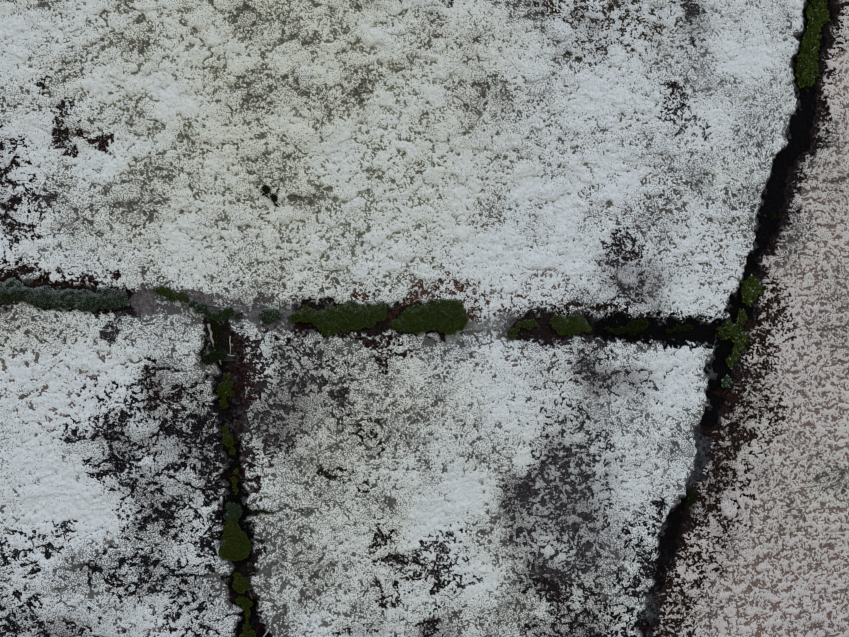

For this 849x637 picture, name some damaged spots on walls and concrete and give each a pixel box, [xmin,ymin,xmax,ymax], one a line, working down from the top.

water stain [51,98,114,158]
water stain [20,190,63,214]
crack [0,270,137,319]
crack [294,293,463,343]
crack [511,0,849,637]
water stain [60,334,385,637]
crack [203,318,272,637]
water stain [501,333,678,637]
water stain [0,519,104,637]